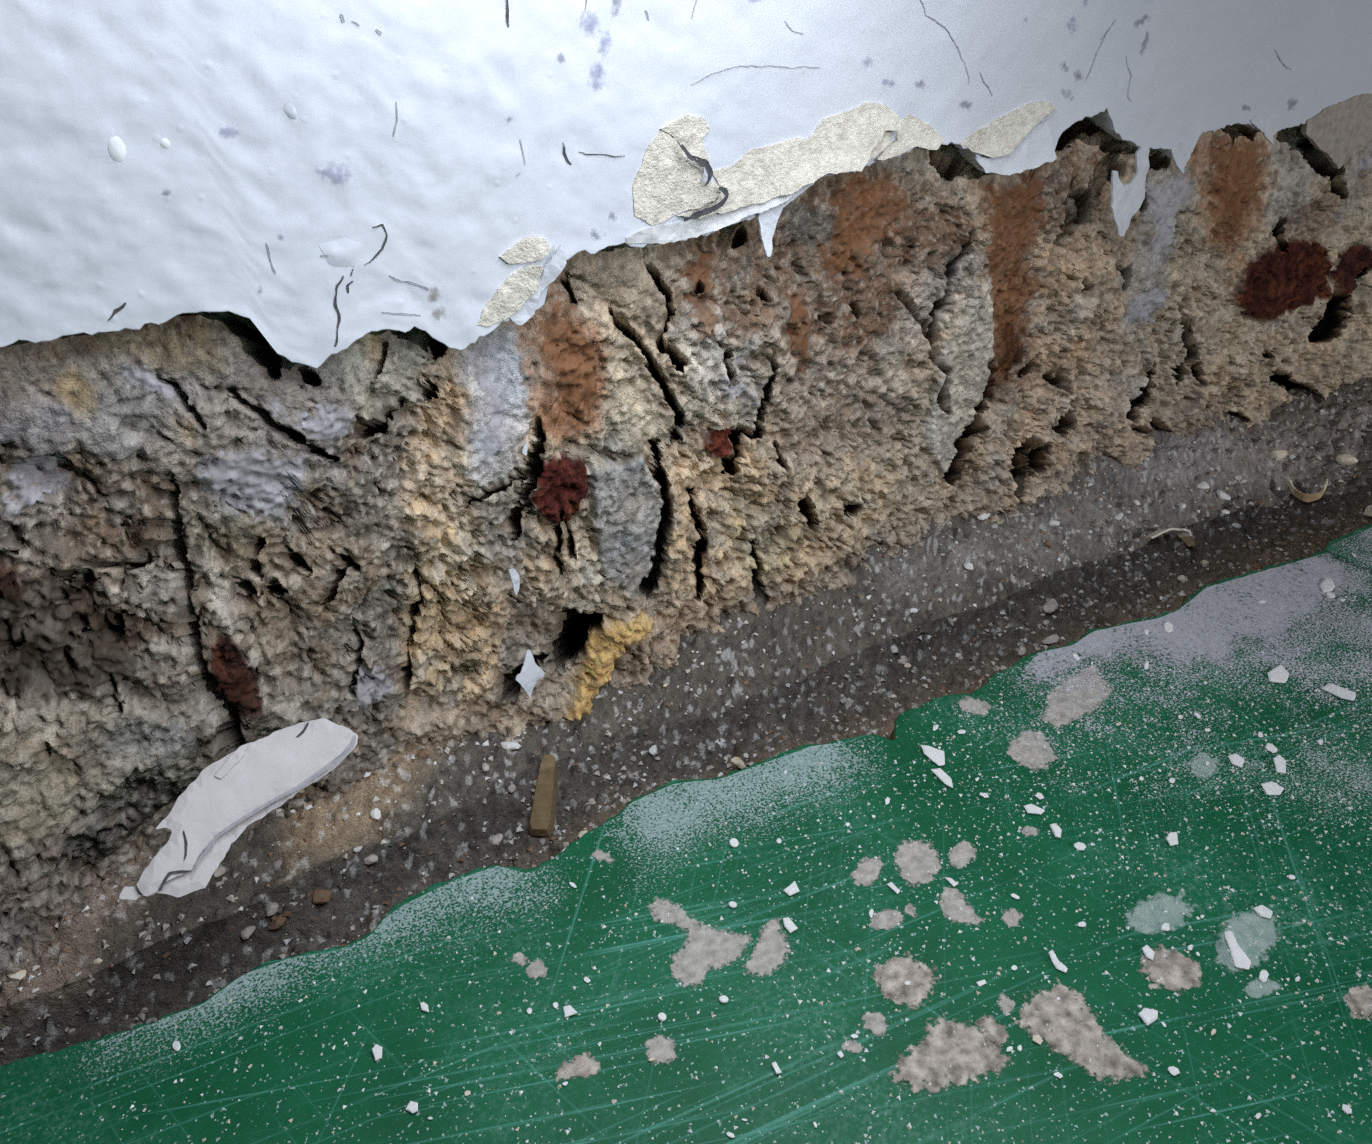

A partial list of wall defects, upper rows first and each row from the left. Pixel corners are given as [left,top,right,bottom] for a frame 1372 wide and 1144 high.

crack [340,14,382,35]
crack [563,143,619,165]
crack [320,224,429,347]
crack [108,302,126,321]
flaking render [0,93,1372,998]
flaking render [1138,1008,1158,1026]